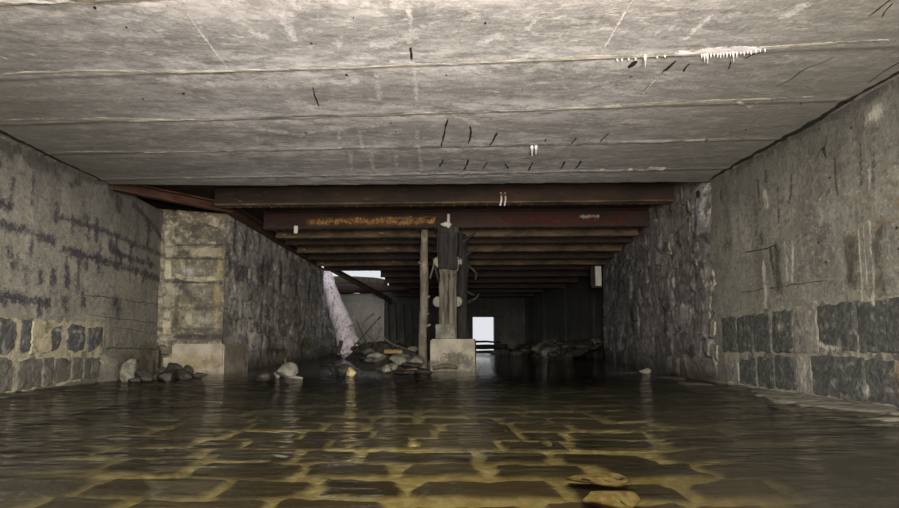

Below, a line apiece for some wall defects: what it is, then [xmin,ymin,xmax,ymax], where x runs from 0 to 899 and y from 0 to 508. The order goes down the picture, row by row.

water stain [220,1,269,40]
water stain [267,0,305,42]
water stain [326,0,421,49]
water stain [779,4,810,19]
water stain [0,14,895,181]
crack [439,119,533,170]
rust [307,216,435,226]
water stain [757,170,792,222]
water stain [760,235,794,309]
water stain [846,220,883,306]